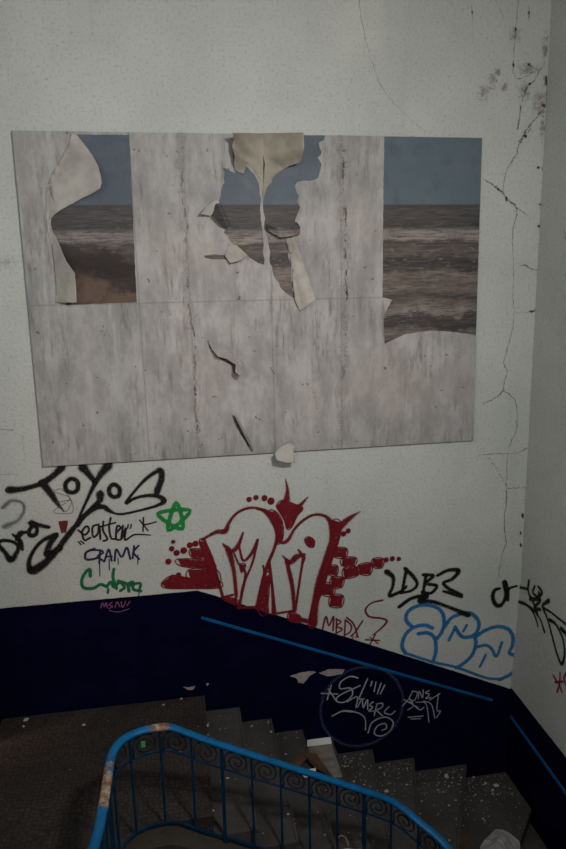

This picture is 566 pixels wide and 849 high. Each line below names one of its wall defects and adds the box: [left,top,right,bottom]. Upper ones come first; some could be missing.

crack [483,61,547,569]
peeling [290,669,345,684]